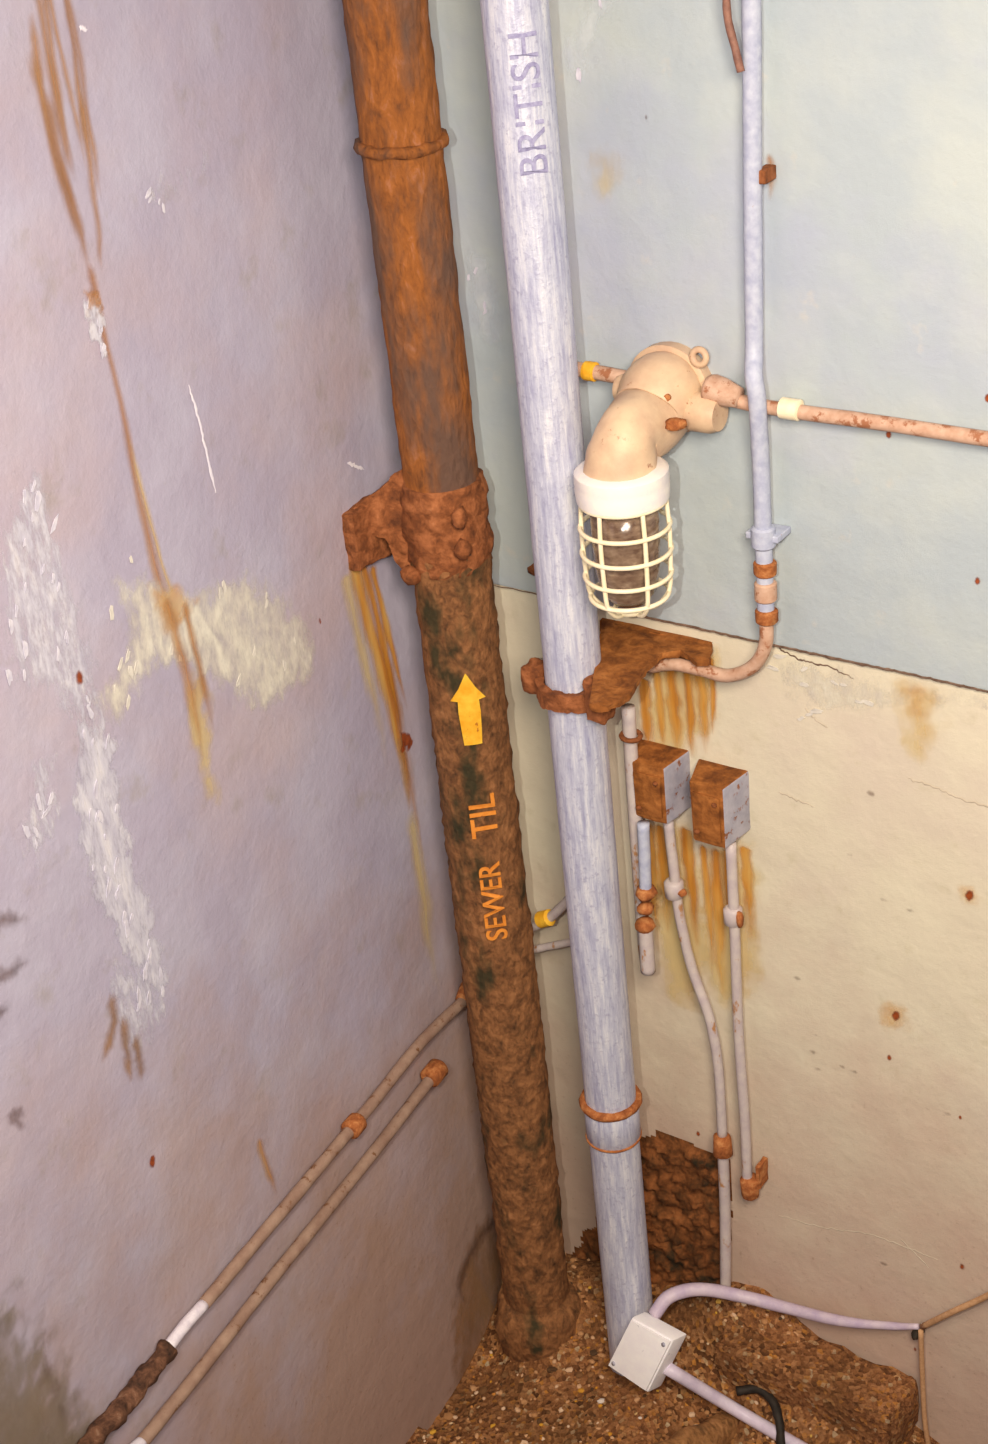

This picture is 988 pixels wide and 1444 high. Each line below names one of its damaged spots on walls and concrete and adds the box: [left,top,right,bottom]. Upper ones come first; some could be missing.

rust [33,0,99,226]
rust [99,311,207,748]
rust [346,566,413,779]
rust [640,659,715,745]
rust [650,825,753,993]